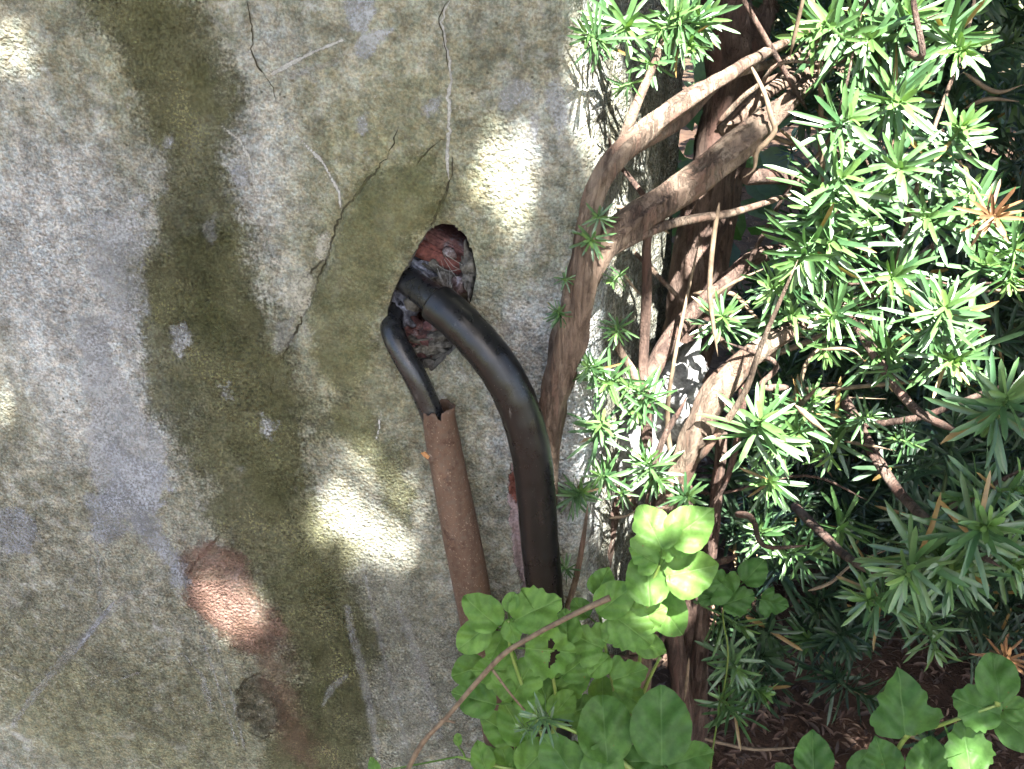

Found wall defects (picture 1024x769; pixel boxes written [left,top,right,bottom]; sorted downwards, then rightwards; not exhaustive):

water stain [111,0,220,143]
crack [247,1,276,101]
water stain [284,118,341,207]
crack [280,126,399,361]
water stain [145,224,472,769]
corrosion [178,543,286,654]